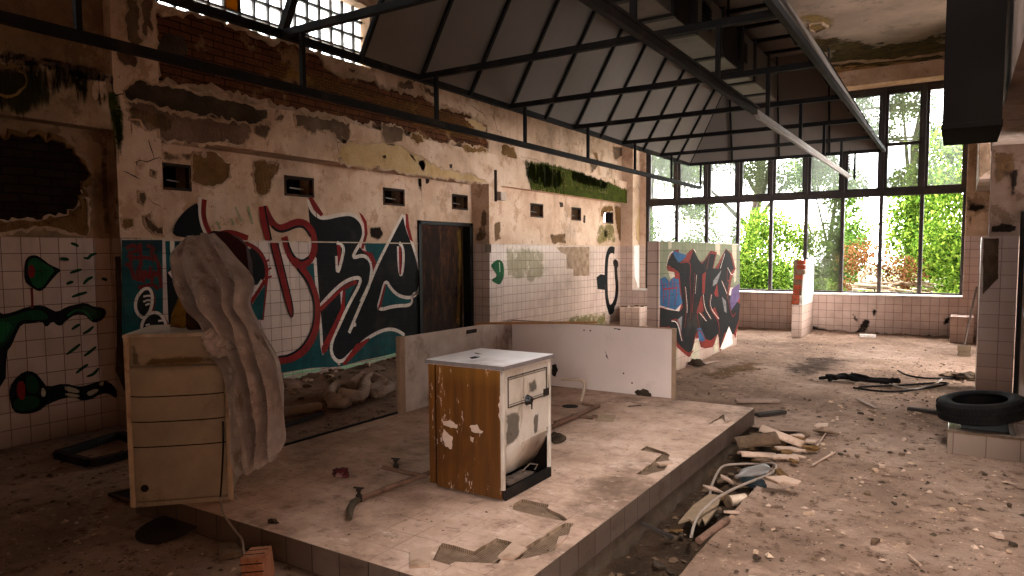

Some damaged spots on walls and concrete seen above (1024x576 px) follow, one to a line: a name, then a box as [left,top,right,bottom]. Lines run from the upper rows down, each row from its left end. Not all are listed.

damp [800,15,945,70]
damp [0,51,113,115]
flaking render [112,0,517,189]
flaking render [0,128,92,237]
peeling [250,159,280,198]
peeling [557,247,590,276]
peeling [640,449,669,475]
peeling [435,542,509,565]
peeling [513,503,571,560]